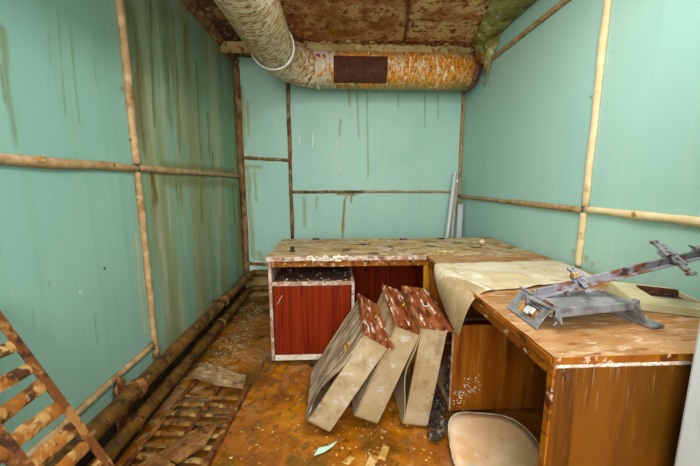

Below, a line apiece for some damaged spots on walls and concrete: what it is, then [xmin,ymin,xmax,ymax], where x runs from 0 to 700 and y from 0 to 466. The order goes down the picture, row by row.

peeling [300,0,537,85]
corrosion [387,0,460,46]